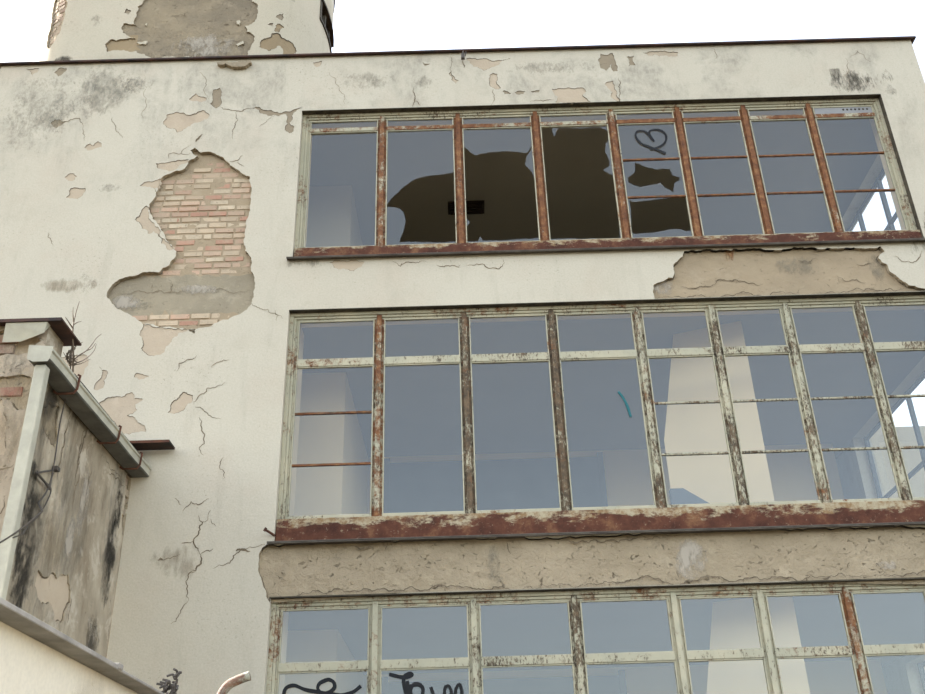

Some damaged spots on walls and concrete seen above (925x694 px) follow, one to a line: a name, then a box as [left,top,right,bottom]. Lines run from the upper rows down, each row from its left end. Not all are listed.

spalling [105,0,297,58]
peeling [552,88,590,105]
peeling [598,53,620,102]
spalling [107,148,255,356]
spalling [653,247,925,299]
peeling [61,354,89,378]
peeling [94,369,146,434]
crack [178,355,227,478]
damp [11,492,41,608]
damp [65,479,90,556]
damp [104,492,123,578]
crack [158,498,265,624]